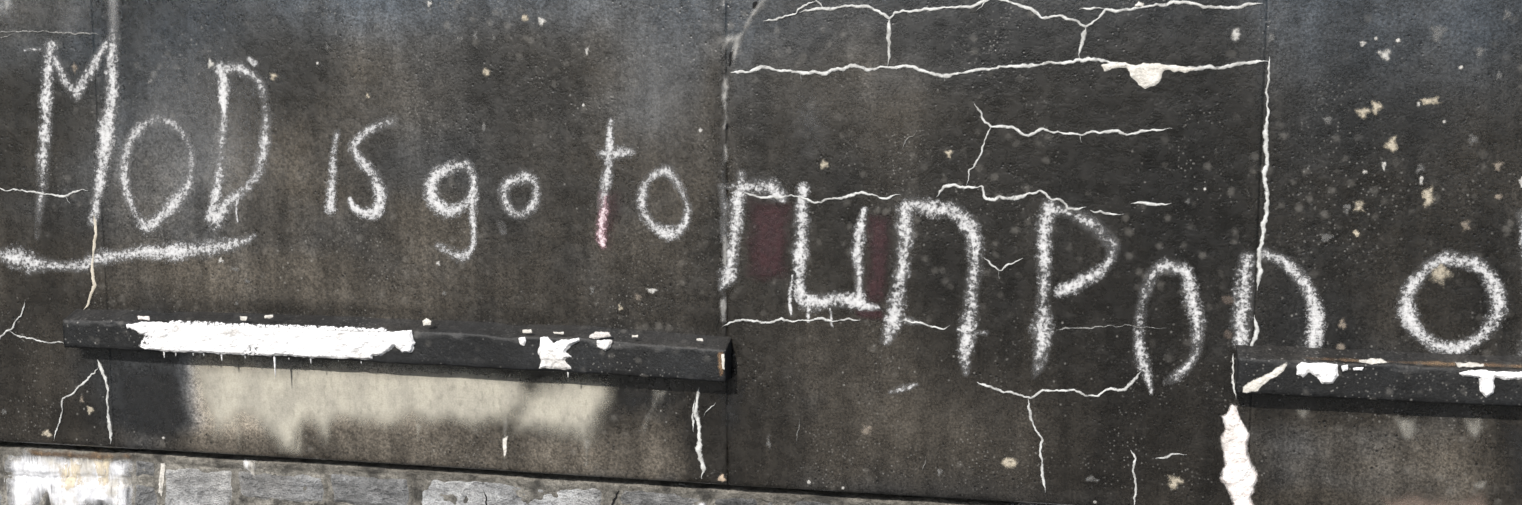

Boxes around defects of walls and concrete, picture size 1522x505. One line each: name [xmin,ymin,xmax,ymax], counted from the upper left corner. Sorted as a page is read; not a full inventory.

crack [0,30,97,38]
crack [0,188,97,310]
crack [724,0,1270,395]
crack [0,302,63,344]
crack [54,359,112,444]
water stain [125,320,612,446]
crack [977,369,1143,488]
crack [1130,450,1187,505]